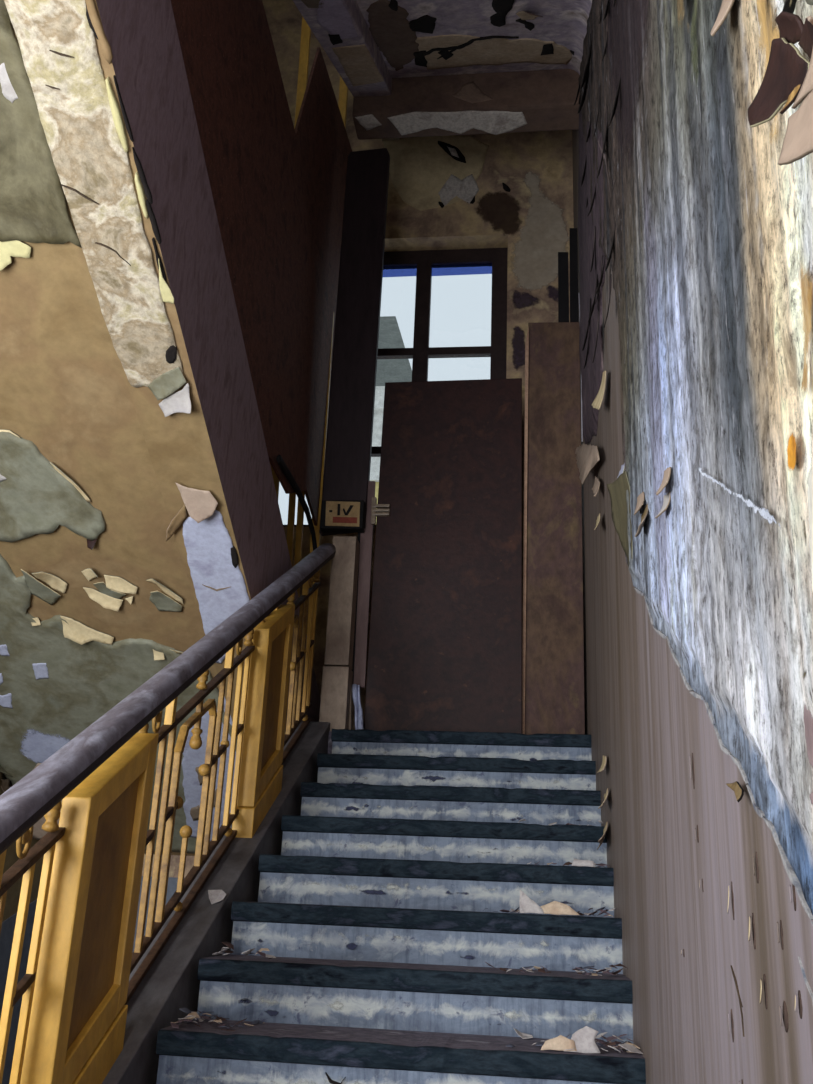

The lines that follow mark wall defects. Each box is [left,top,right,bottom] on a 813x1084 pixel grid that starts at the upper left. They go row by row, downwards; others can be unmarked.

leakage [605,0,647,160]
flaking render [0,0,192,417]
leakage [477,171,569,309]
leakage [512,326,525,369]
peeling [0,429,106,550]
flaking render [166,482,250,635]
flaking render [409,0,813,926]
leakage [699,468,781,537]
peeling [0,554,184,792]
peeling [32,800,62,840]
peeling [354,884,421,895]
peeling [748,913,756,949]